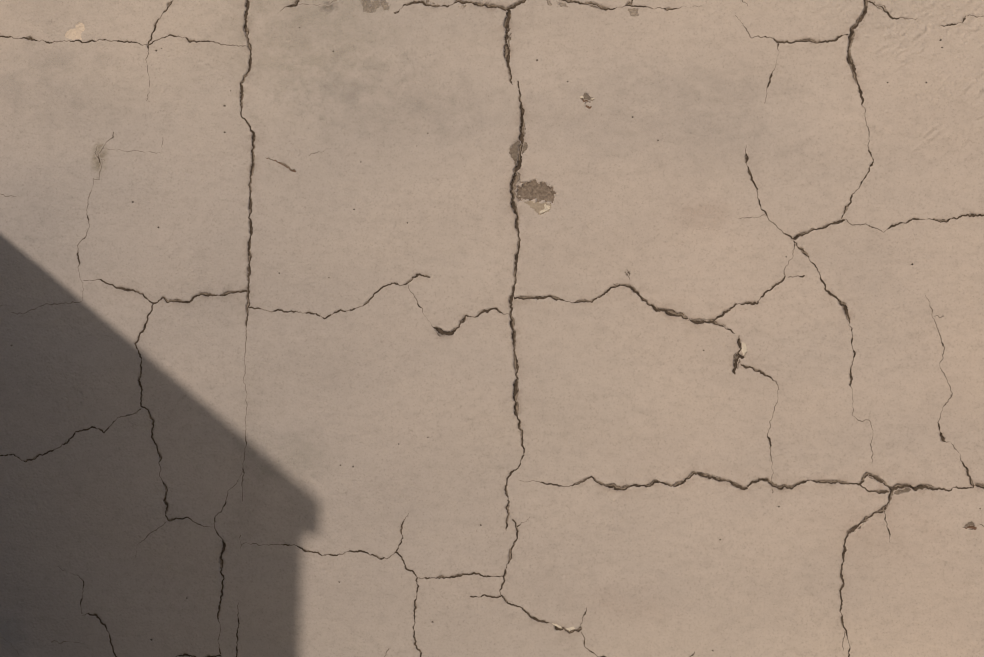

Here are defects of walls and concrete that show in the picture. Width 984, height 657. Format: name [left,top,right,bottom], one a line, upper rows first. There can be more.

crack [0,0,805,556]
spalling [516,179,556,215]
crack [740,0,984,388]
crack [520,295,984,657]
crack [55,565,117,657]
crack [206,494,228,657]
crack [234,603,242,657]
crack [239,513,606,657]